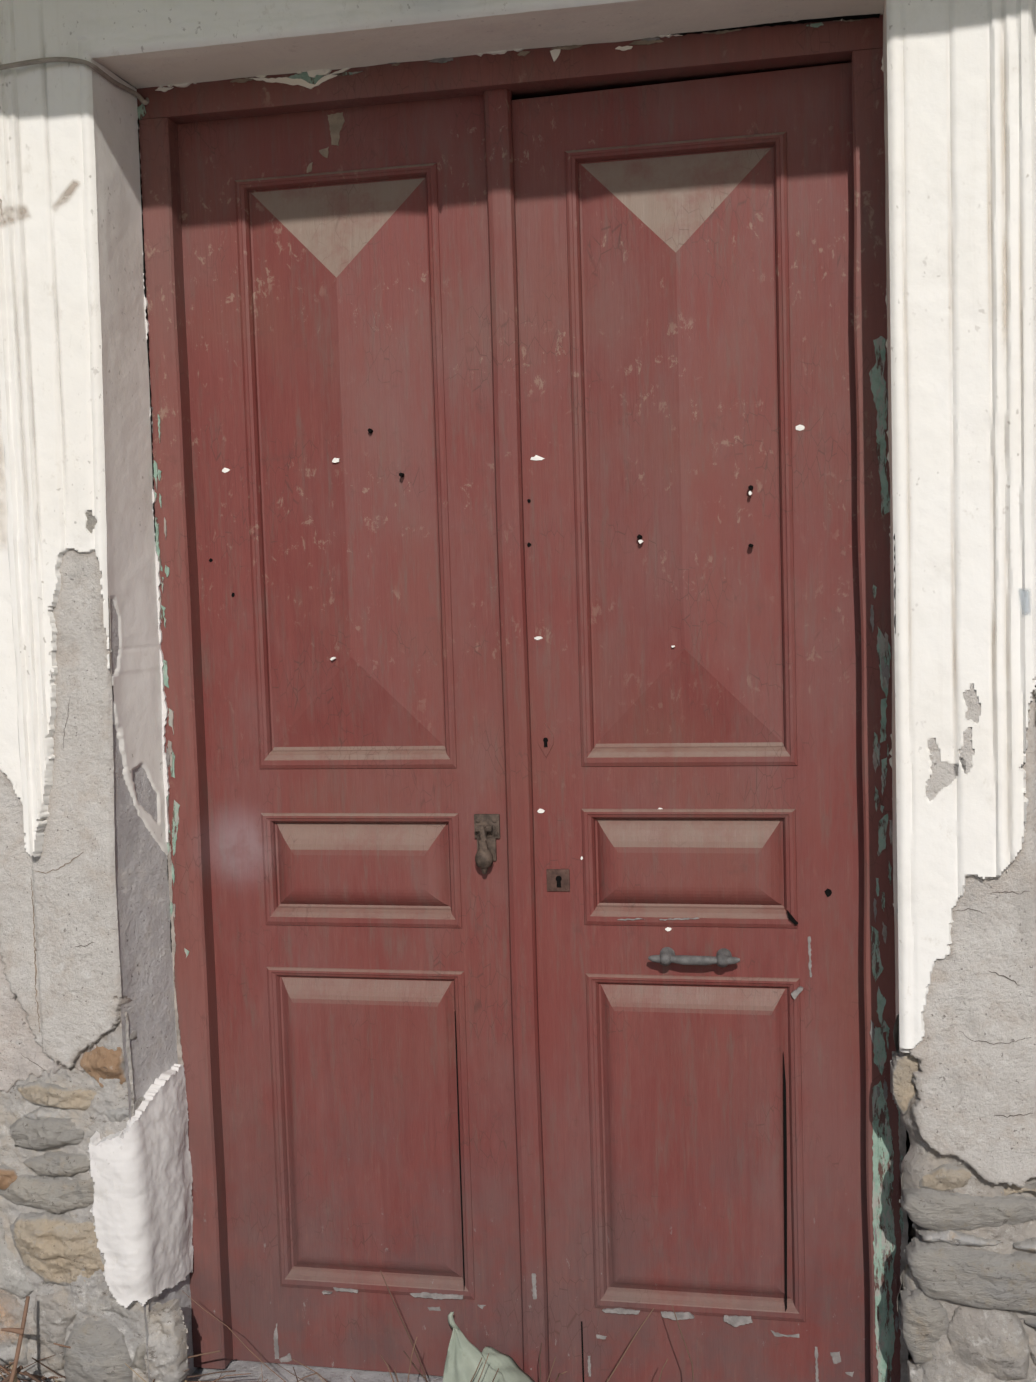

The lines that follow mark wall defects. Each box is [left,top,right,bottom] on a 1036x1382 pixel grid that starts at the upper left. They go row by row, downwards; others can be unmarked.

peeling [85,510,97,533]
peeling [153,460,170,628]
spalling [0,549,198,1382]
peeling [870,585,1036,1382]